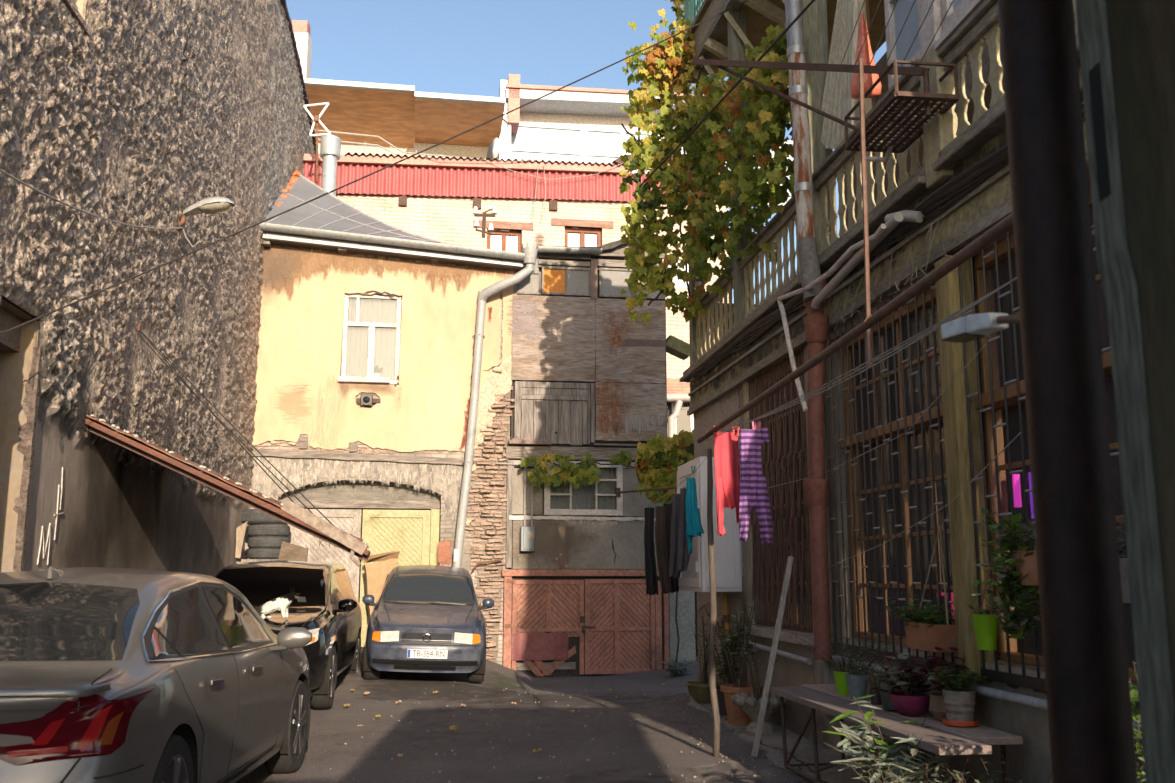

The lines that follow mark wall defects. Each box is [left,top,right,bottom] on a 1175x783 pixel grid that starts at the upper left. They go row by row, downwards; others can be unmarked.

leakage [263,244,507,299]
spalling [13,347,43,571]